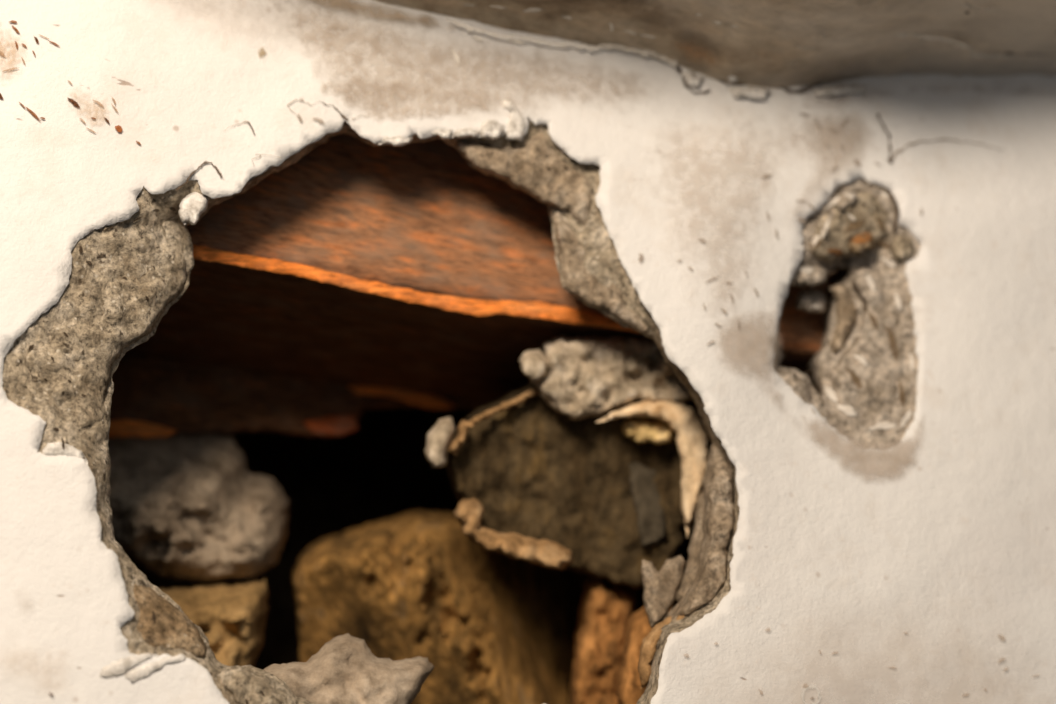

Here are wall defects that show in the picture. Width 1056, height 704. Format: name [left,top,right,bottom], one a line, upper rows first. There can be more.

water stain [298,0,566,115]
crack [876,114,1002,164]
crack [866,181,899,229]
water stain [707,263,773,375]
flaking render [773,178,921,450]
flaking render [2,99,740,704]
water stain [810,424,918,478]